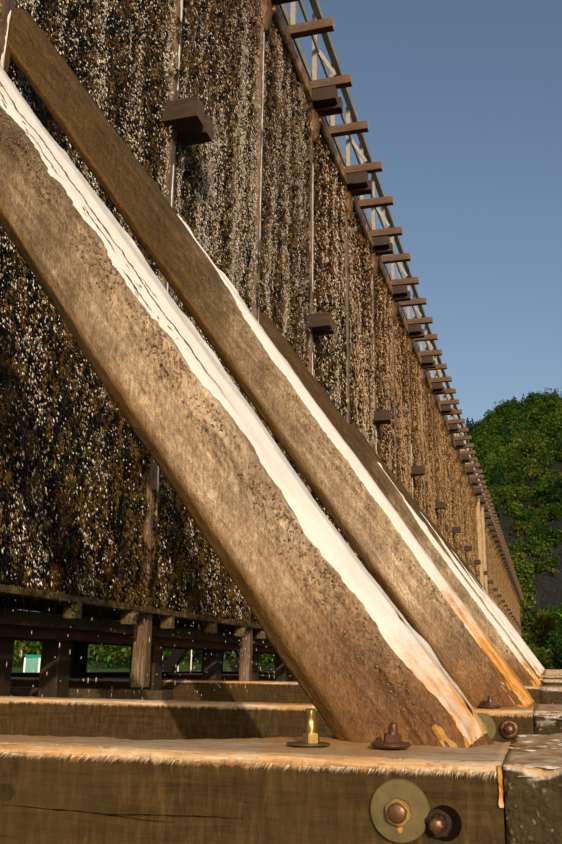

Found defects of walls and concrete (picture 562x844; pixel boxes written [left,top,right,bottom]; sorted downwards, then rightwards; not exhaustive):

corrosion [431,724,488,748]
spalling [514,764,560,778]
crack [0,804,241,823]